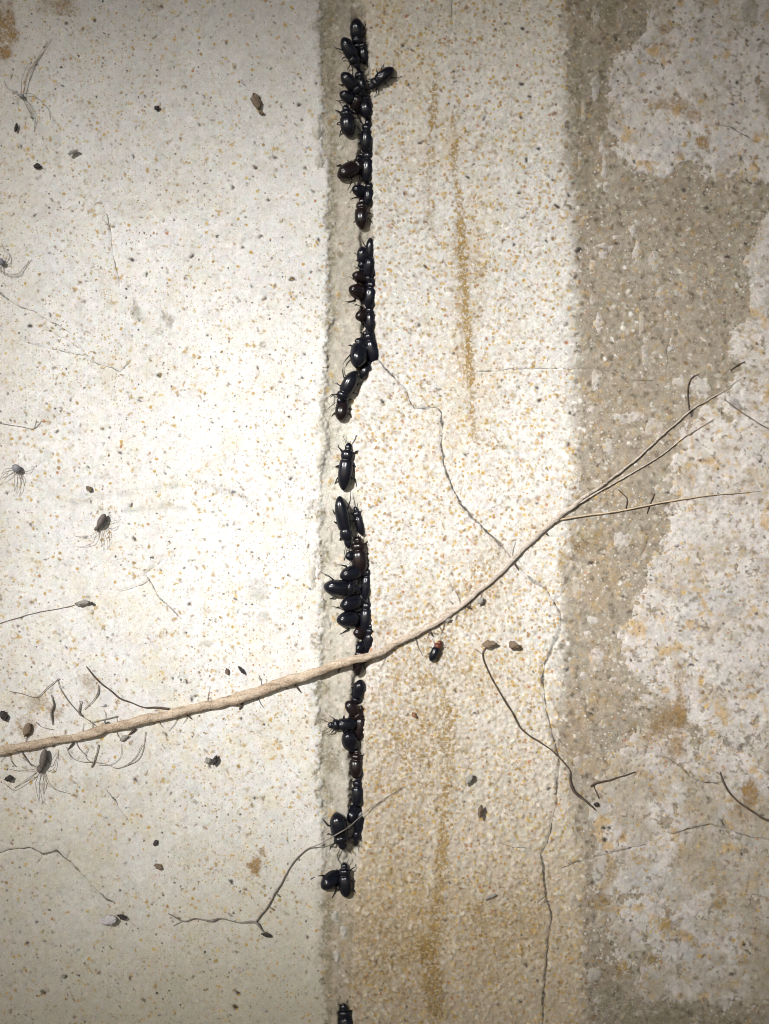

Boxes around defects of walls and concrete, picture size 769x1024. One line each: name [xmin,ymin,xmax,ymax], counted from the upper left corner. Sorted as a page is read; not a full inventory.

crack [379,361,501,546]
crack [0,847,73,864]
crack [507,648,580,1024]